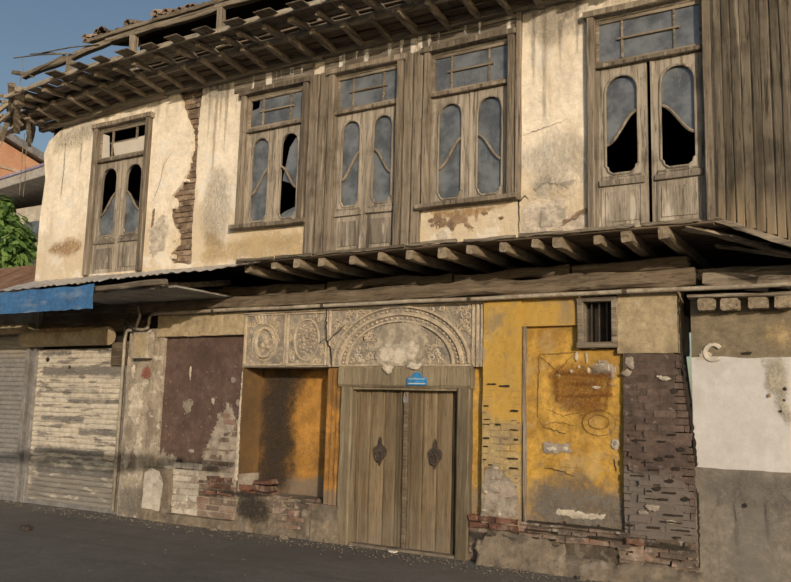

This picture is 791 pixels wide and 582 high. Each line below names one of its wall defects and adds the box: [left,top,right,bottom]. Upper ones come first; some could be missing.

spalling [147,88,203,265]
flaking render [428,213,474,239]
peeling [43,366,121,376]
flaking render [368,318,431,374]
peeling [34,446,104,457]
peeling [41,416,116,437]
peeling [68,365,149,470]
flaking render [142,447,182,511]
peeling [188,372,320,530]
peeling [468,464,522,540]
peeling [556,508,606,520]